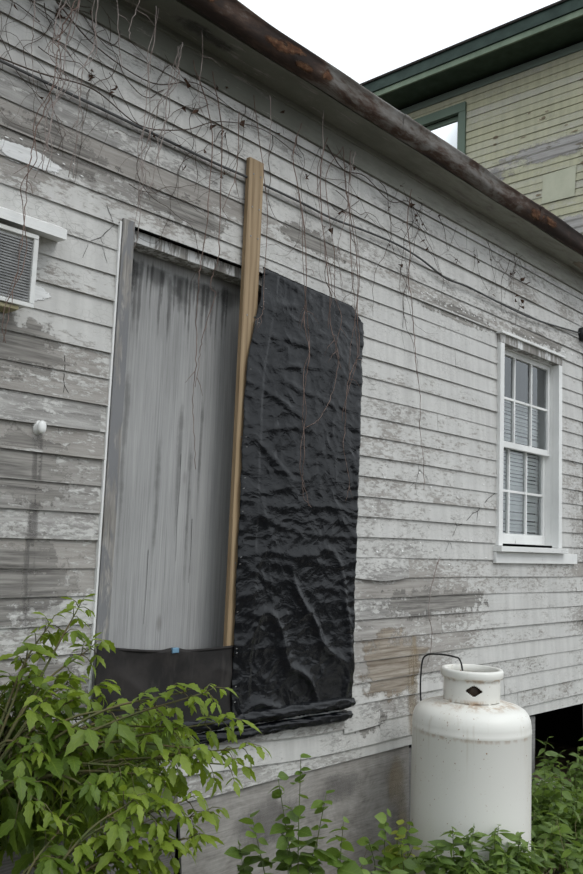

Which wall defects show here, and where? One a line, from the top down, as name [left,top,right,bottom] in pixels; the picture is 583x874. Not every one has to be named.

rust [266,36,333,81]
peeling [0,107,122,181]
peeling [139,183,229,239]
peeling [34,285,52,301]
peeling [0,312,76,380]
peeling [510,327,577,360]
peeling [0,422,83,515]
peeling [0,537,79,630]